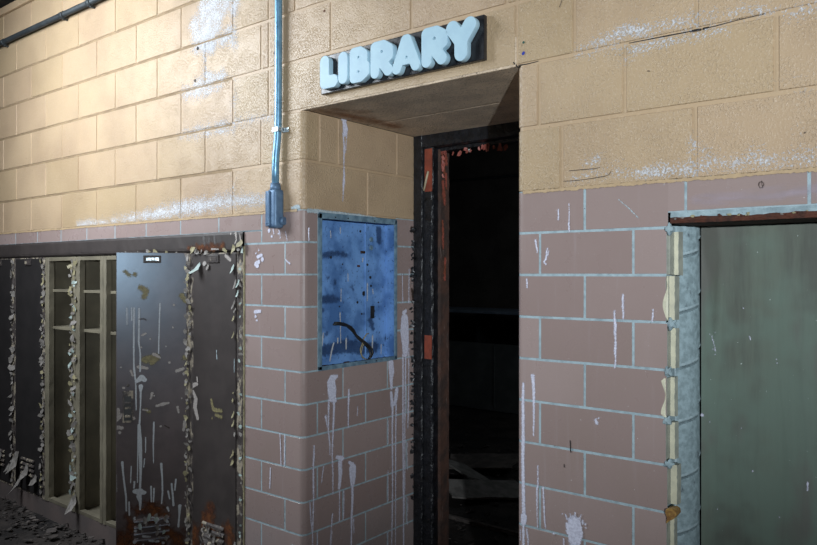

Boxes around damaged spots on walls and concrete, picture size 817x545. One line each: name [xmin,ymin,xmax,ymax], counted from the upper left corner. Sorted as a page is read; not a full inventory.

efflorescence [182,0,241,102]
damp [578,8,731,70]
crack [630,13,765,43]
peeling [441,143,508,178]
efflorescence [574,139,817,179]
efflorescence [76,186,265,228]
corrosion [117,500,234,545]